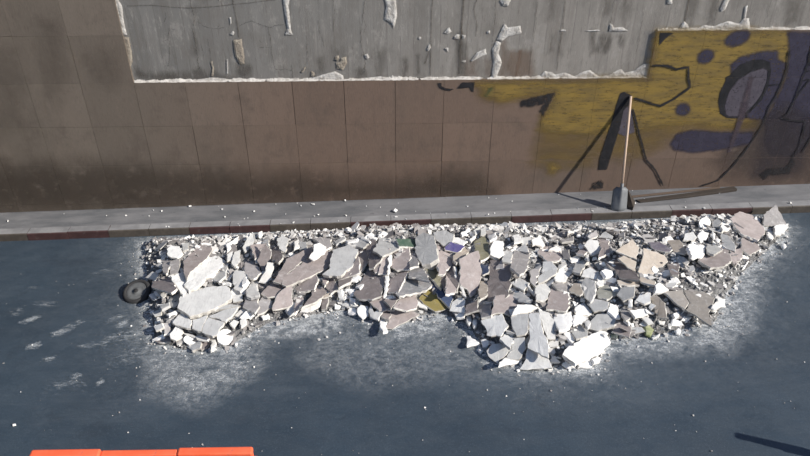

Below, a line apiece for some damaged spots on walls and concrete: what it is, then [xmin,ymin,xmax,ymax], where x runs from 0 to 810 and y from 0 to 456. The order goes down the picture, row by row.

peeling [115,0,810,82]